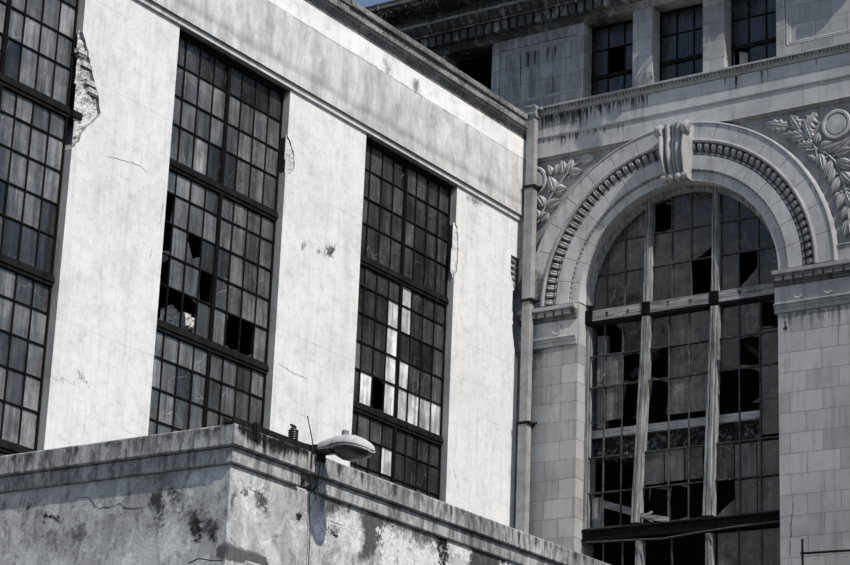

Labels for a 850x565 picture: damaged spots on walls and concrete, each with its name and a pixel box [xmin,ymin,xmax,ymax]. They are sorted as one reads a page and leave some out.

spalling [72,30,98,144]
leakage [541,96,648,143]
spalling [284,135,294,173]
spalling [450,222,458,277]
crack [79,497,158,534]
leakage [148,475,219,543]
leakage [225,488,268,518]
leakage [319,495,450,565]
leakage [468,548,509,565]